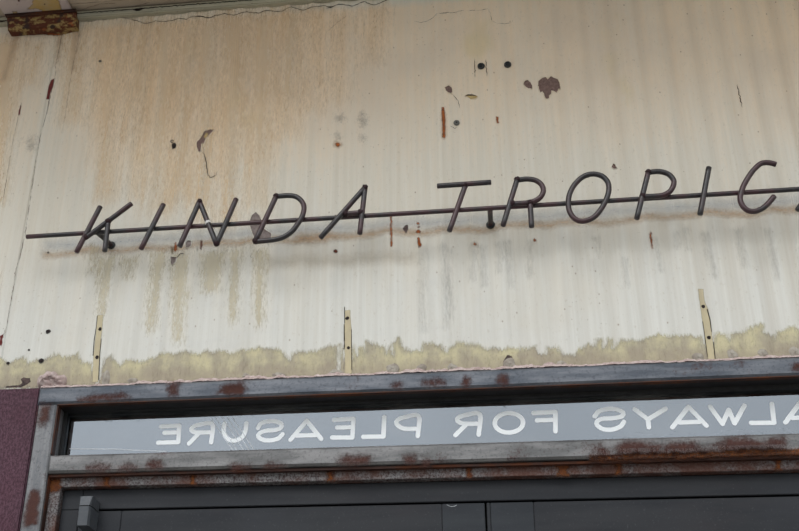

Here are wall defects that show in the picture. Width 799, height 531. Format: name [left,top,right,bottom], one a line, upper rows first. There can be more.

crack [39,0,386,143]
spalling [523,76,561,100]
spalling [196,129,215,153]
rust [166,382,180,396]
rust [219,381,245,395]
rust [339,455,370,466]
rust [23,489,40,526]